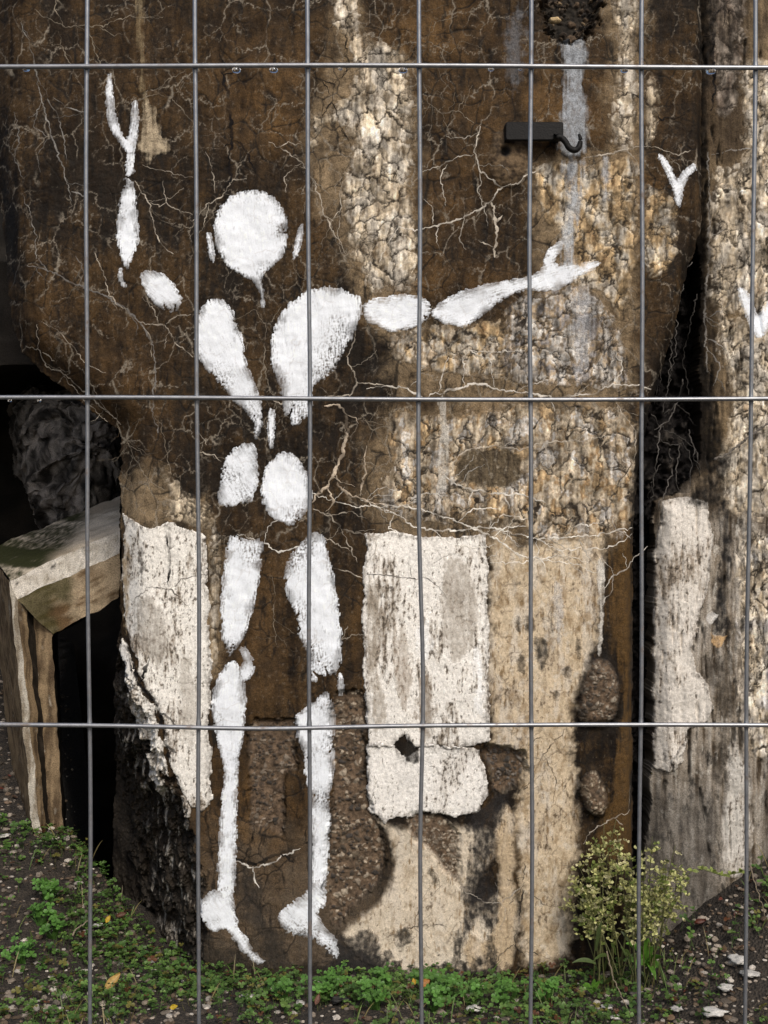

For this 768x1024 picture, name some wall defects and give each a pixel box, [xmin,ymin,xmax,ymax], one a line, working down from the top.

crack [11,0,193,515]
crack [135,54,346,254]
crack [311,4,351,145]
crack [379,4,542,262]
damp [499,0,529,100]
damp [554,37,614,387]
crack [584,79,759,394]
crack [306,334,651,606]
peeling [310,0,681,973]
spalling [247,718,299,836]
damp [403,733,420,764]
damp [312,789,513,979]